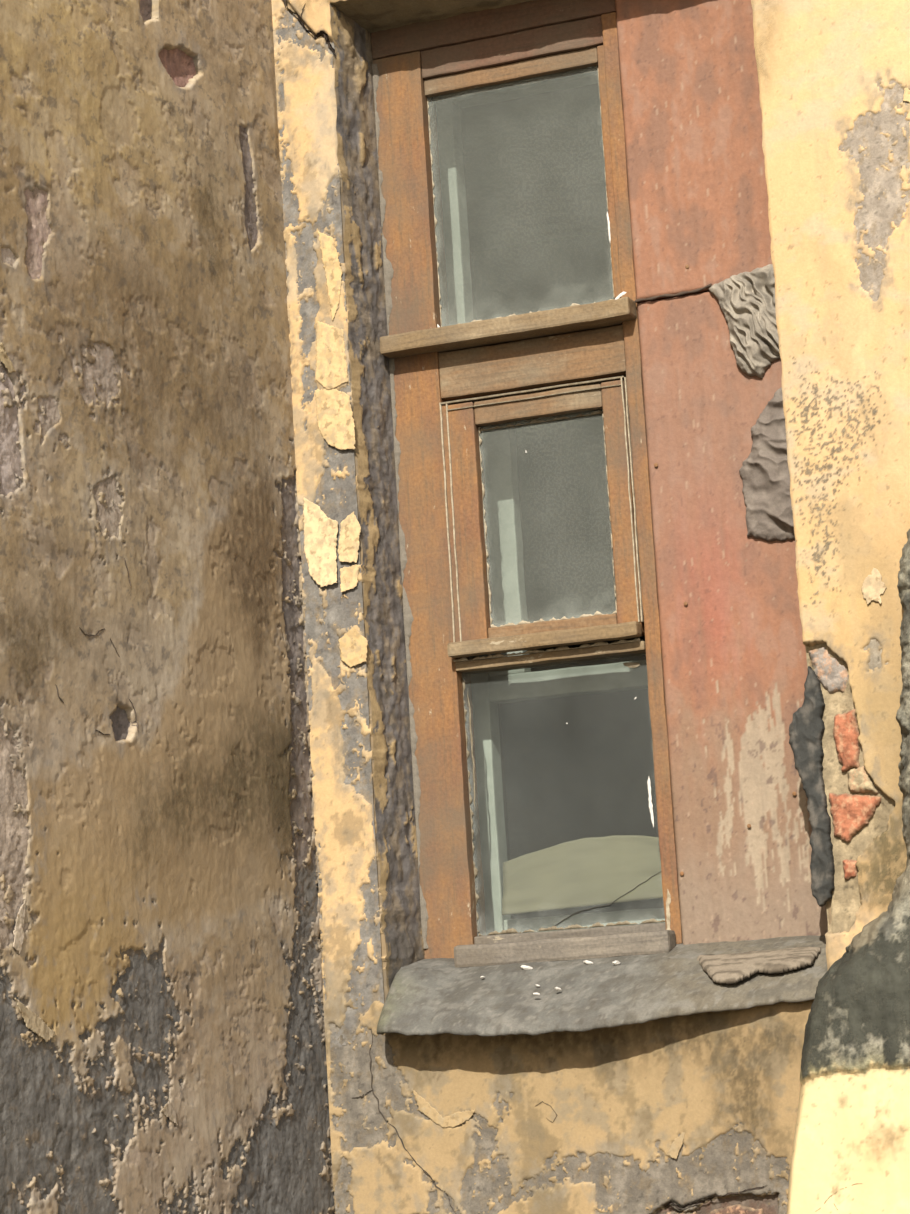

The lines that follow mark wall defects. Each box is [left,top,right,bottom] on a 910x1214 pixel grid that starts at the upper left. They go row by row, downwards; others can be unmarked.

crack [283,0,336,54]
peeling [24,186,52,280]
peeling [839,79,910,302]
peeling [0,342,70,496]
peeling [58,334,130,420]
peeling [88,469,125,564]
peeling [158,10,790,1214]
peeling [861,568,887,604]
spalling [805,639,895,933]
flaking render [0,695,189,1214]